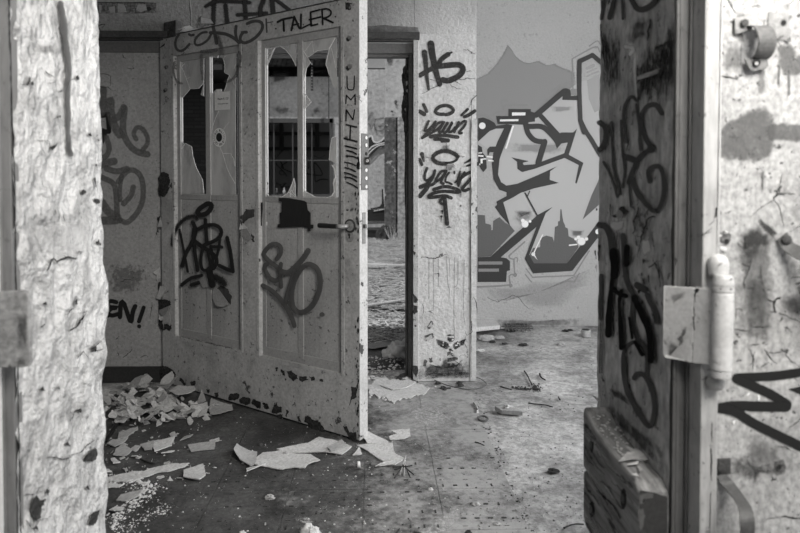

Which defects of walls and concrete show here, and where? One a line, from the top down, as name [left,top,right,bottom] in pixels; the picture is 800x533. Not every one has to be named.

crack [754,193,800,229]
peeling [159,366,196,386]
peeling [275,367,323,382]
peeling [206,389,324,432]
spalling [84,447,98,462]
spalling [26,488,52,531]
spalling [87,510,100,533]